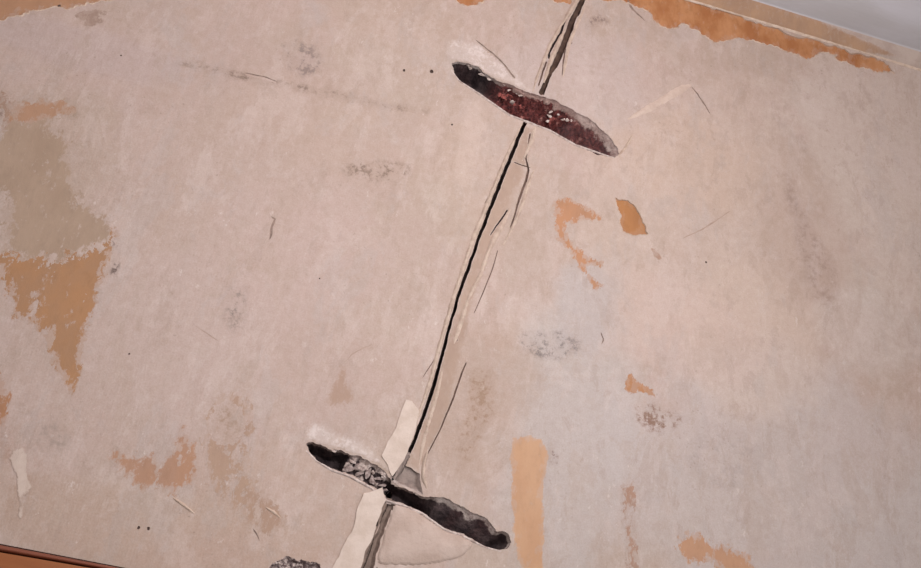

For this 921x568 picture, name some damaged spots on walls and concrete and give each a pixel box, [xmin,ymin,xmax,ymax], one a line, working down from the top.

peeling [0,0,113,27]
crack [532,0,585,95]
peeling [602,0,895,74]
peeling [0,91,122,398]
peeling [552,197,604,292]
peeling [615,197,649,236]
crack [333,119,536,568]
peeling [0,366,13,427]
spalling [344,459,388,492]
peeling [509,435,550,568]
peeling [674,529,754,568]